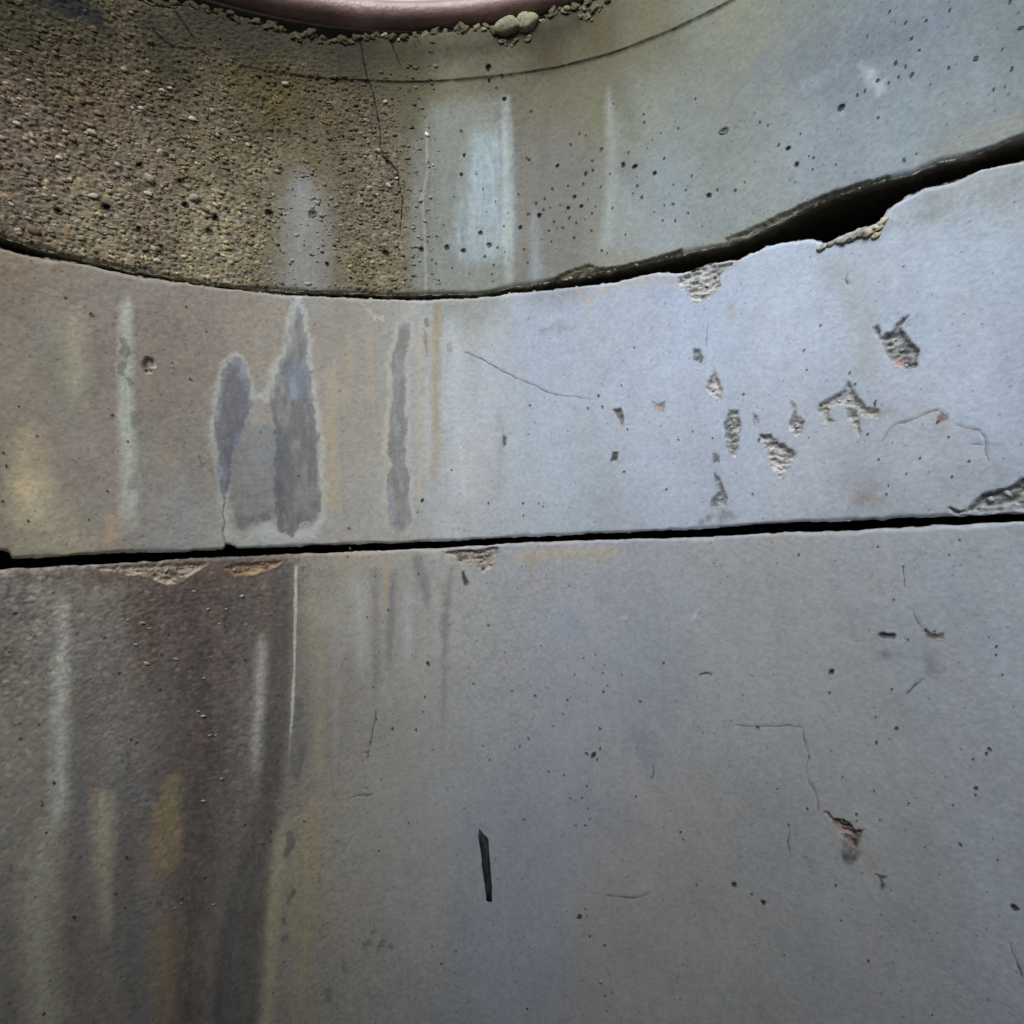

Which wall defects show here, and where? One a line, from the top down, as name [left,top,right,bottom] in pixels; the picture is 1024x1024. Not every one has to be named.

crack [351,33,407,228]
spalling [88,558,285,593]
damp [203,157,345,547]
damp [358,85,661,537]
crack [466,352,571,397]
spalling [676,260,740,306]
spalling [691,347,806,508]
spalling [871,314,921,372]
spalling [945,476,1024,516]
damp [3,566,273,1024]
damp [286,567,308,812]
crack [739,725,819,810]